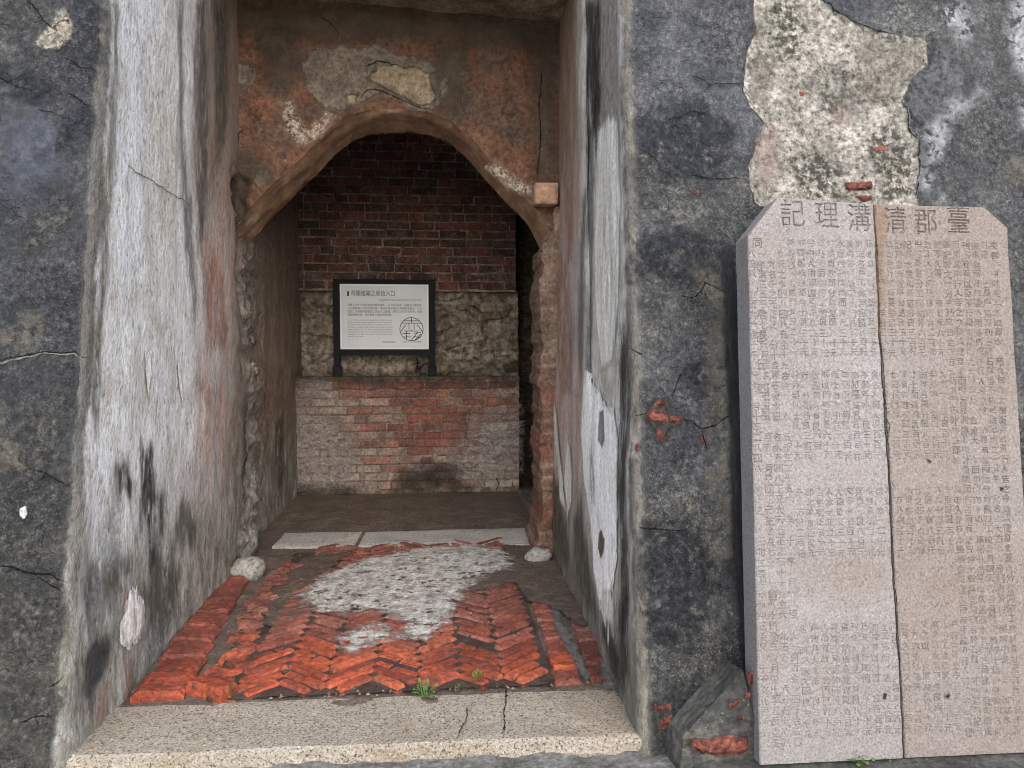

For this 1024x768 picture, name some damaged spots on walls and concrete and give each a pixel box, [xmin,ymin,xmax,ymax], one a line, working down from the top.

peeling [36,0,105,63]
peeling [301,43,449,112]
spalling [743,0,928,207]
crack [129,166,188,204]
crack [0,349,84,364]
spalling [646,398,683,444]
peeling [580,369,619,611]
leakage [115,444,196,650]
leakage [84,514,131,709]
peeling [119,586,145,651]
crack [501,689,509,737]
spalling [689,735,749,756]